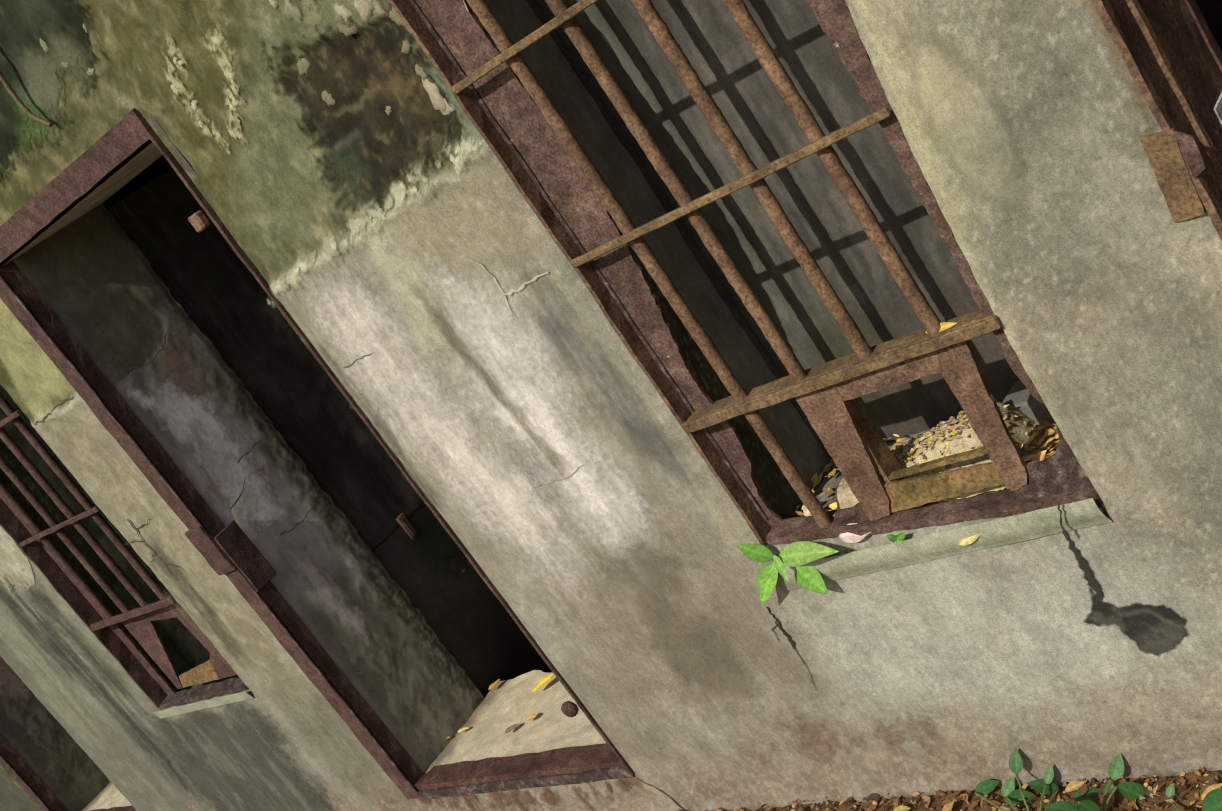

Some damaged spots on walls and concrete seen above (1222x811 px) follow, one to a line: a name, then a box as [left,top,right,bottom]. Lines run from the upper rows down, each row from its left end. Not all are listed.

peeling [165,30,245,154]
crack [766,607,817,692]
corrosion [0,656,29,701]
corrosion [418,788,559,811]
corrosion [573,778,638,811]